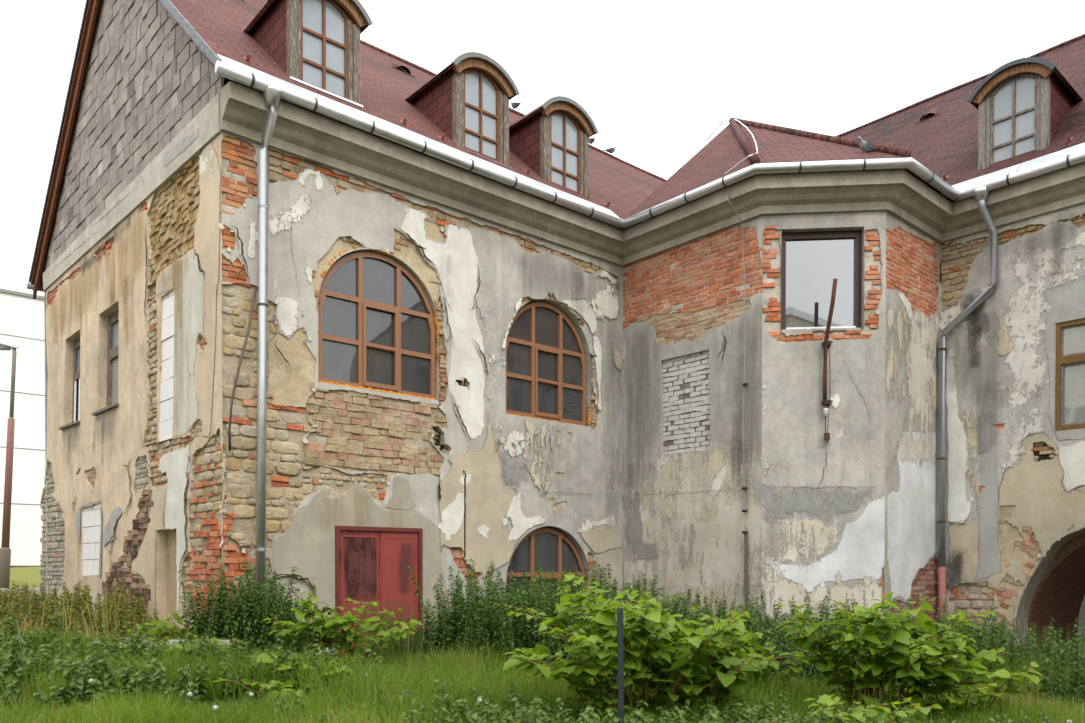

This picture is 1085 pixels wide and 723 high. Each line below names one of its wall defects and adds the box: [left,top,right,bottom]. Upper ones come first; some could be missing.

flaking render [102,135,324,618]
leakage [622,492,658,561]
flaking render [268,208,1085,640]